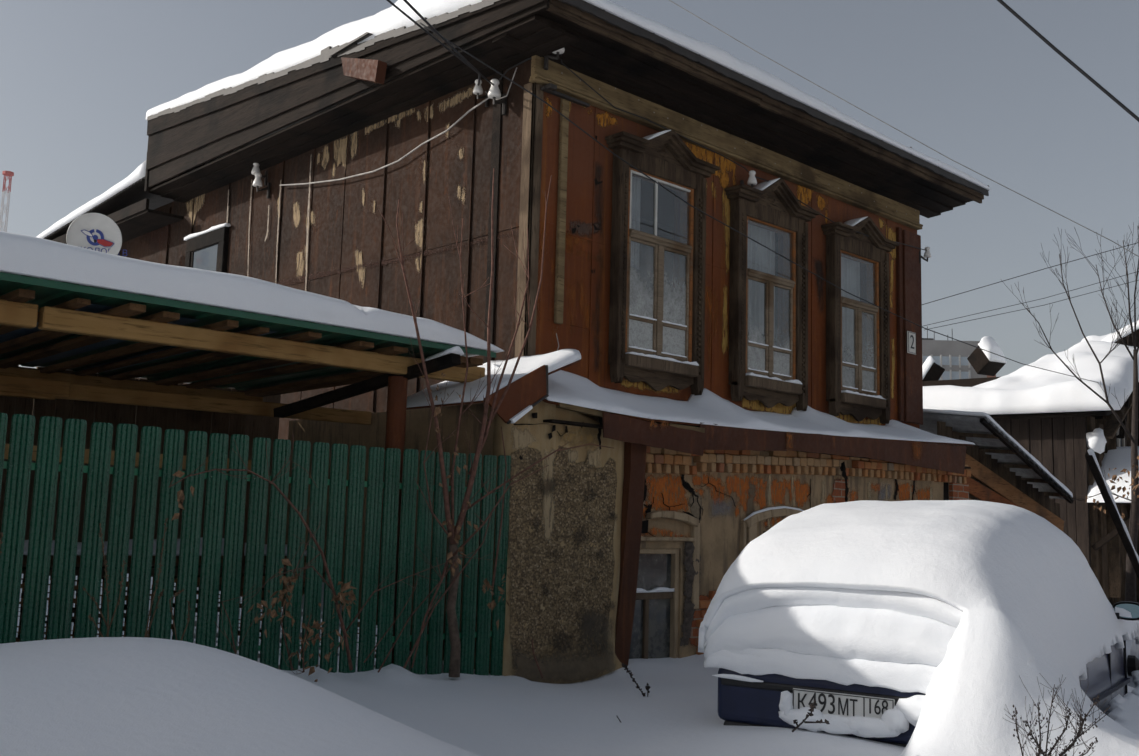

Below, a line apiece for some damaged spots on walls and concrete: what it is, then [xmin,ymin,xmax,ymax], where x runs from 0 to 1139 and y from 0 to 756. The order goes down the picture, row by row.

peeling [317,87,474,177]
peeling [186,194,205,224]
peeling [277,198,315,230]
peeling [415,202,423,270]
peeling [296,251,308,281]
peeling [356,250,365,285]
spalling [827,479,858,503]
peeling [895,483,930,501]
peeling [641,474,810,655]